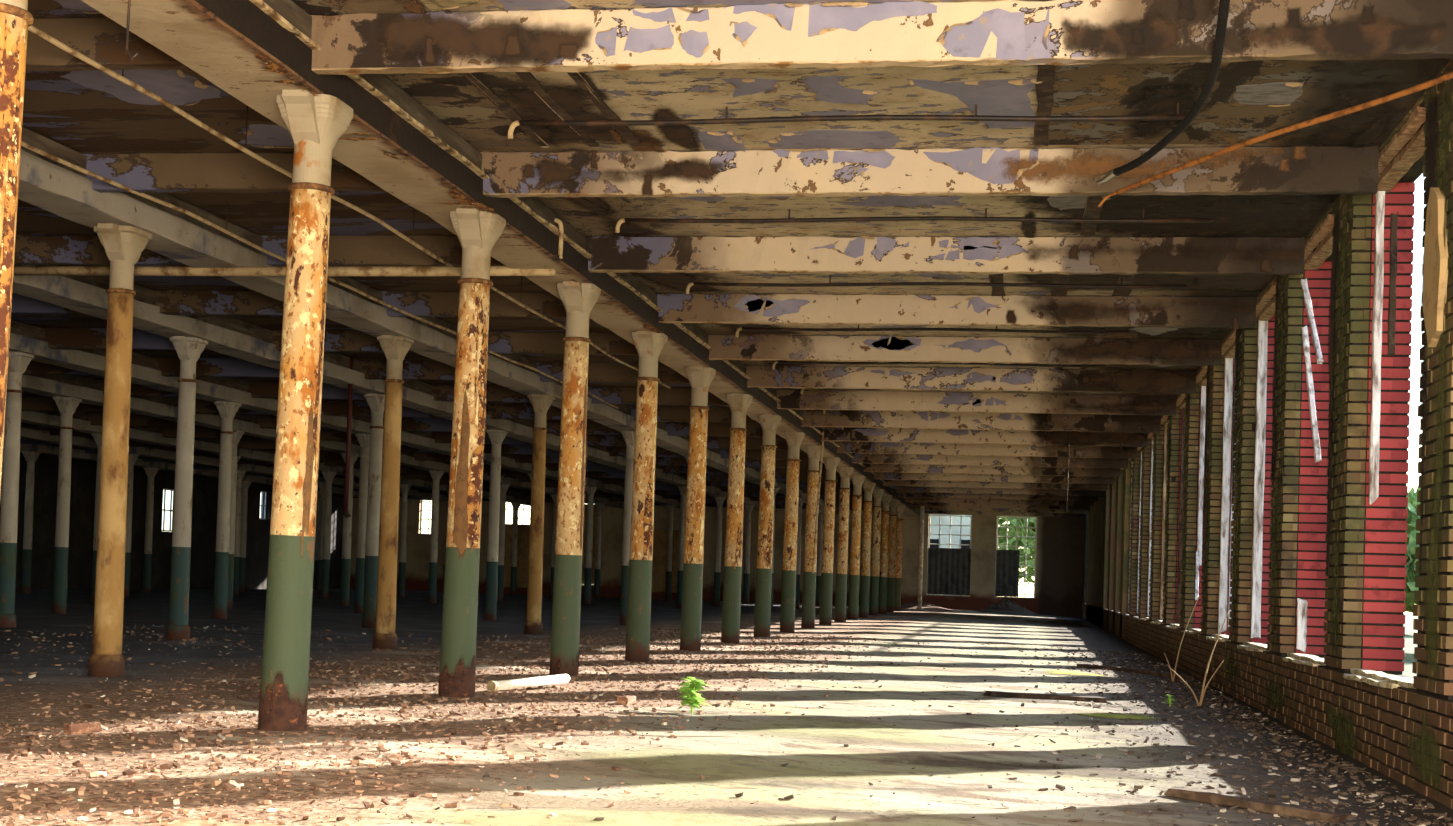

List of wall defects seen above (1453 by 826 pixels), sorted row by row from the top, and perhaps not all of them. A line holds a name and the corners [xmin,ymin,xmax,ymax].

peeling [421,0,571,12]
damp [382,11,723,237]
peeling [595,0,955,58]
peeling [700,130,900,177]
peeling [907,8,1050,129]
damp [1062,0,1195,57]
damp [1129,86,1206,143]
rust [0,20,20,449]
rust [301,215,328,557]
rust [453,299,487,558]
peeling [862,335,922,351]
rust [643,467,653,560]